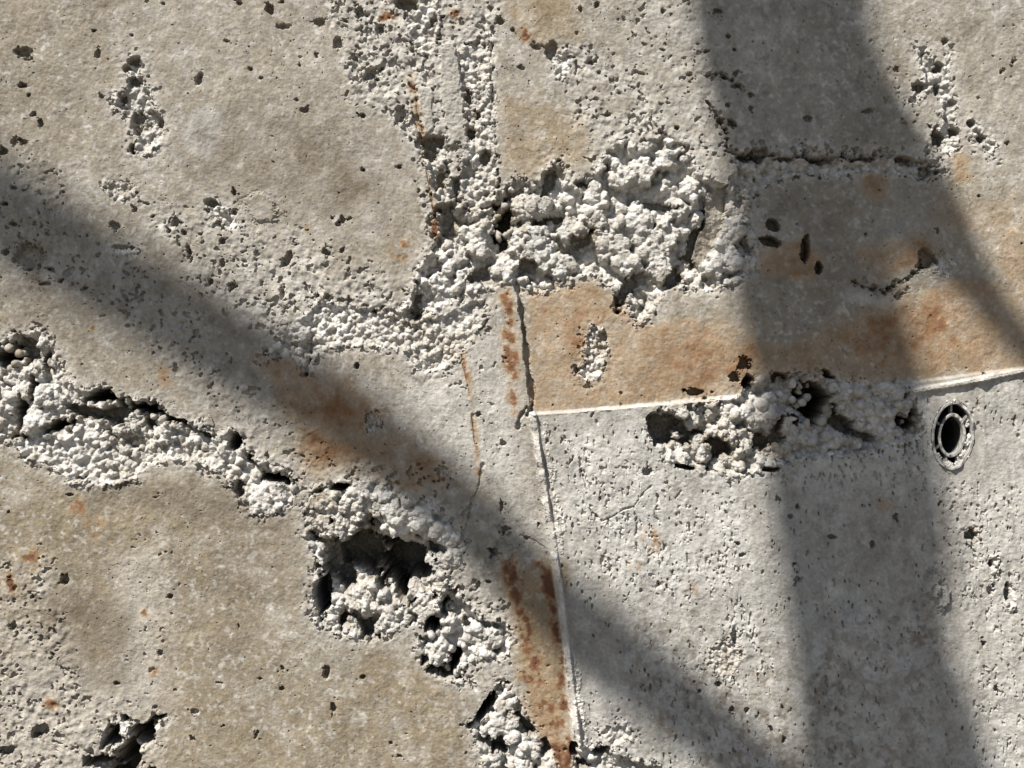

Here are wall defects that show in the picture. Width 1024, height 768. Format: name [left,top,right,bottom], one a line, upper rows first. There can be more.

crack [704,70,943,172]
crack [512,284,539,432]
corrosion [496,229,1024,419]
crack [519,533,552,562]
corrosion [496,554,573,768]